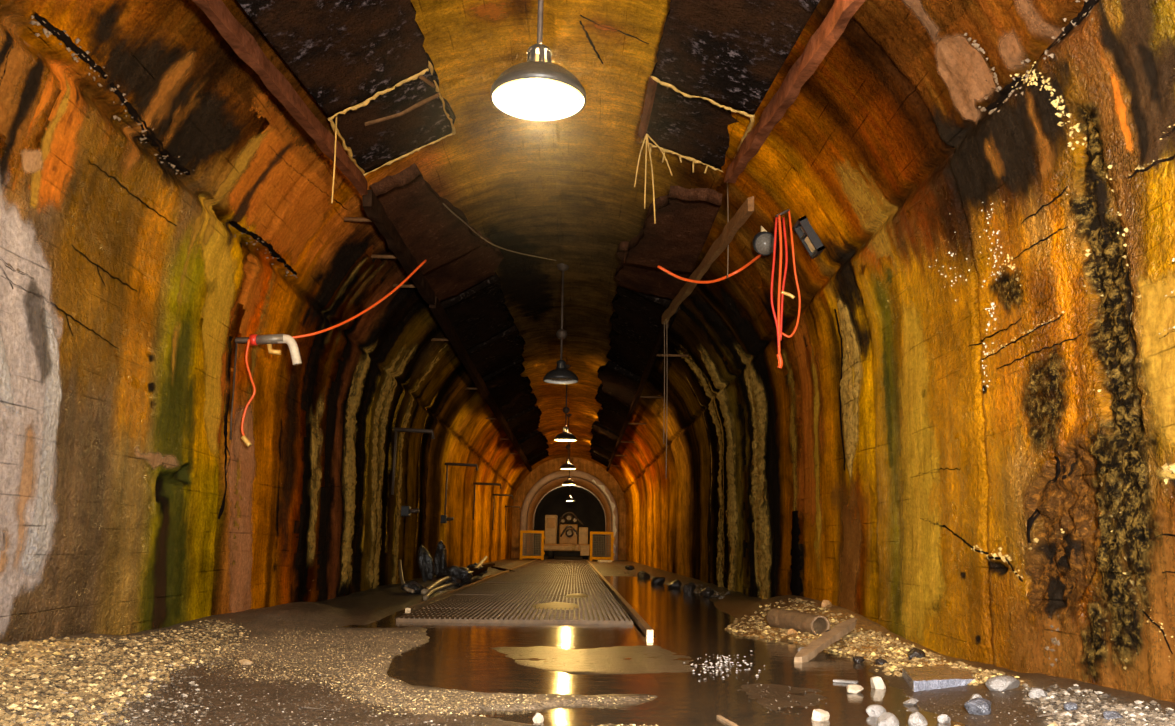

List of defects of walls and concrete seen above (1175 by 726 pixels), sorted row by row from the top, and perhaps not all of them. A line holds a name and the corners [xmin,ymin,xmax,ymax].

crack [1127,124,1175,179]
water stain [0,174,62,634]
crack [0,257,119,349]
crack [968,311,1081,369]
water stain [1138,271,1175,446]
water stain [152,506,186,629]
crack [920,518,1023,582]